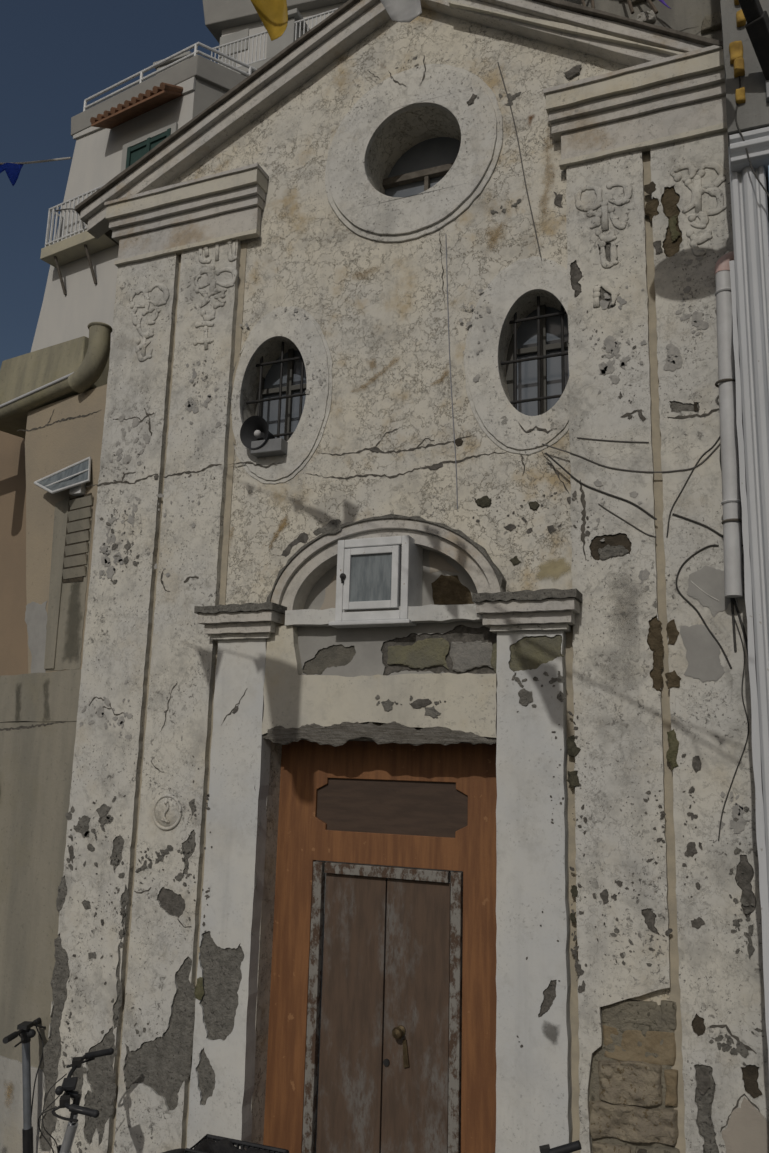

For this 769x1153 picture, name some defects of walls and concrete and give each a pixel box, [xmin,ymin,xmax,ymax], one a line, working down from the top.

flaking render [570,261,583,297]
flaking render [587,285,644,315]
flaking render [644,181,716,344]
peeling [582,327,647,394]
crack [86,461,279,487]
flaking render [589,501,650,584]
flaking render [303,644,356,675]
flaking render [381,625,566,712]
flaking render [647,616,681,693]
flaking render [41,794,244,1153]
flaking render [589,999,680,1153]
flaking render [692,1014,769,1153]